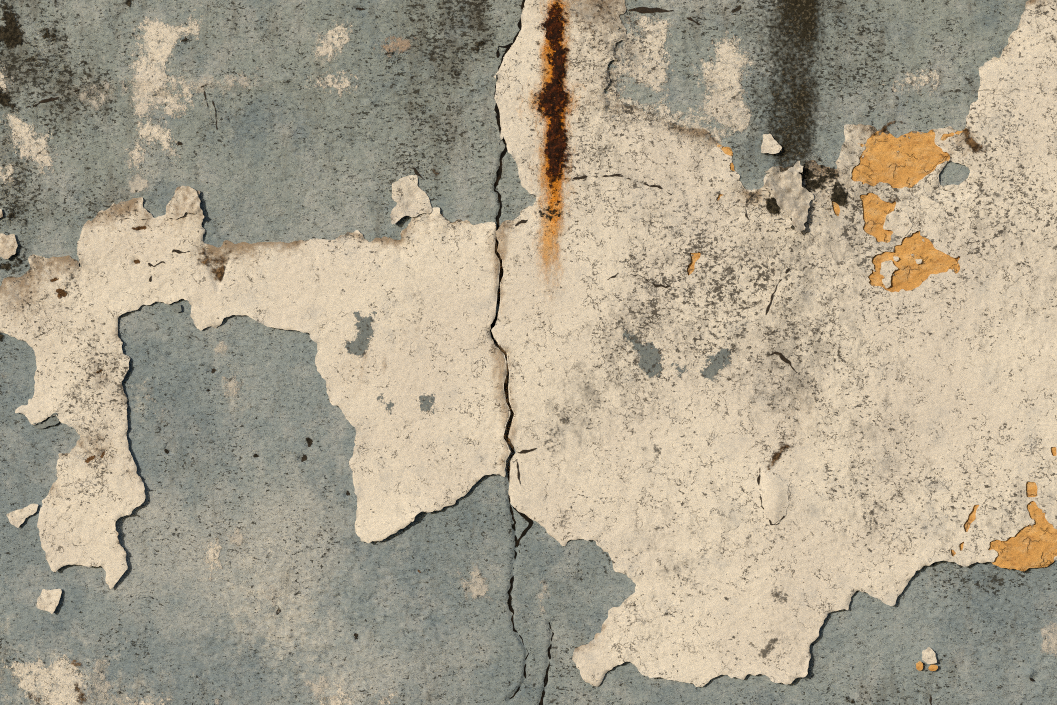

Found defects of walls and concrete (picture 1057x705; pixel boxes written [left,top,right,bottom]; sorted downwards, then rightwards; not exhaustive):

corrosion [531,0,578,267]
leakage [761,0,852,208]
peeling [0,175,511,589]
crack [490,0,554,705]
peeling [491,0,1057,687]